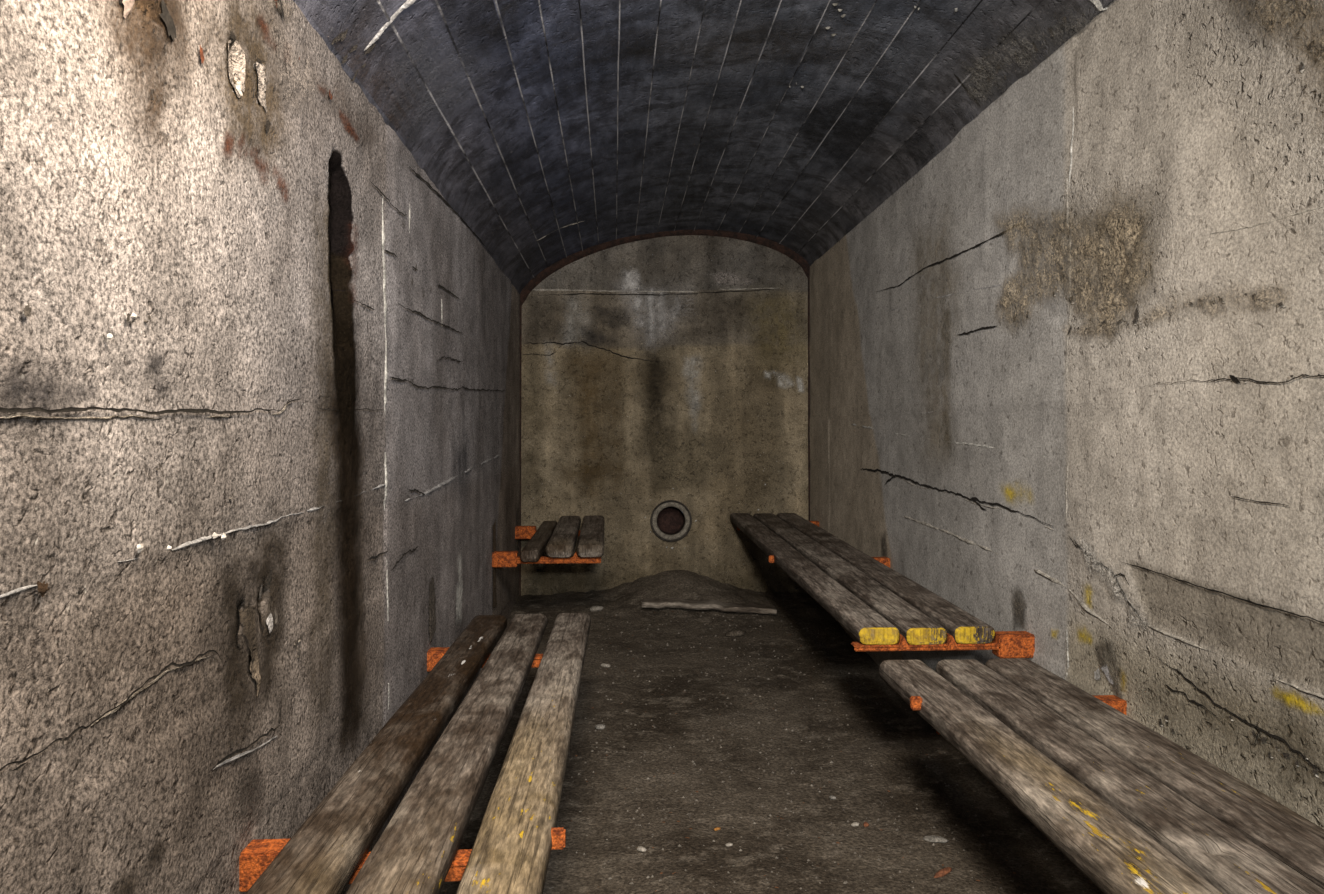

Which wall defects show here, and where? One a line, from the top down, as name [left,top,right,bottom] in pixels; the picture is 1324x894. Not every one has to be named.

crack [371,182,407,216]
crack [409,166,491,253]
crack [876,217,1031,292]
spalling [1000,210,1171,336]
crack [0,249,505,420]
crack [1154,375,1324,385]
leakage [319,150,365,747]
crack [368,547,417,569]
crack [861,468,1324,625]
spalling [257,568,278,633]
spalling [250,652,261,696]